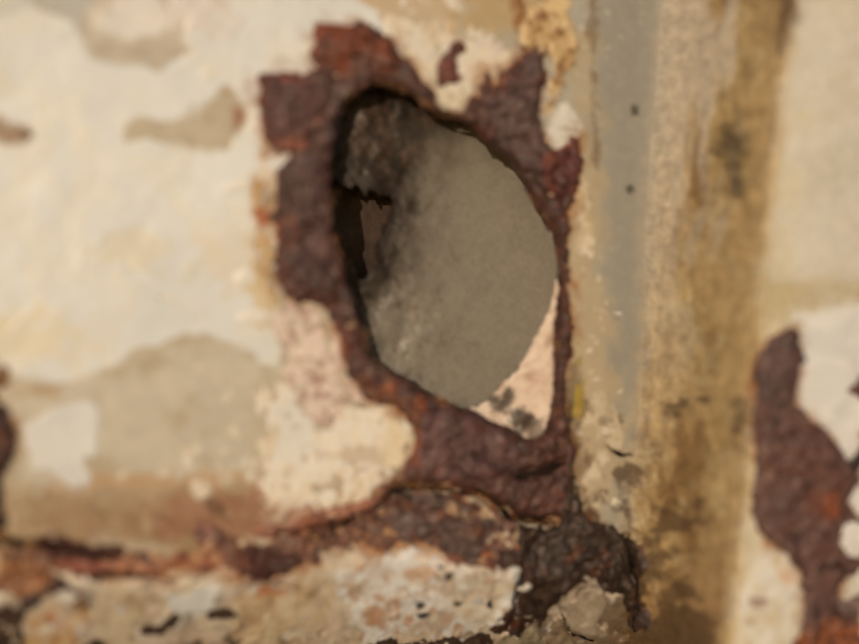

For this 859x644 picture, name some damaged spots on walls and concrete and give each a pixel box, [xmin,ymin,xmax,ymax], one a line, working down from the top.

peeling [0,0,583,529]
rust [0,19,651,638]
peeling [573,178,596,259]
rust [748,327,859,644]
peeling [790,303,859,461]
peeling [840,472,859,558]